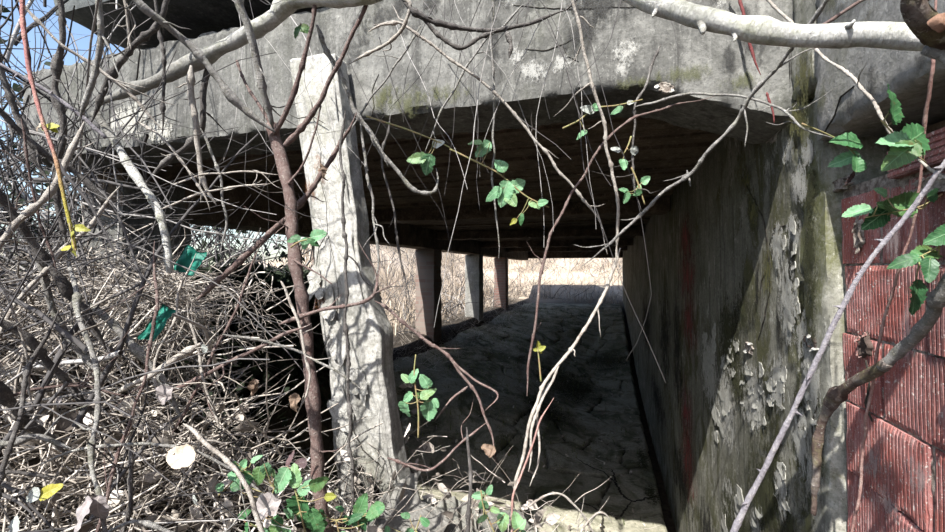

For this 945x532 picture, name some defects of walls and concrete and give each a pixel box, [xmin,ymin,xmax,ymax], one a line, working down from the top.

water stain [487,0,632,81]
water stain [613,41,636,75]
peeling [782,220,801,333]
peeling [307,265,368,433]
peeling [700,322,787,455]
water stain [770,136,822,502]
peeling [795,391,817,438]
crack [864,360,873,422]
crack [572,457,660,532]